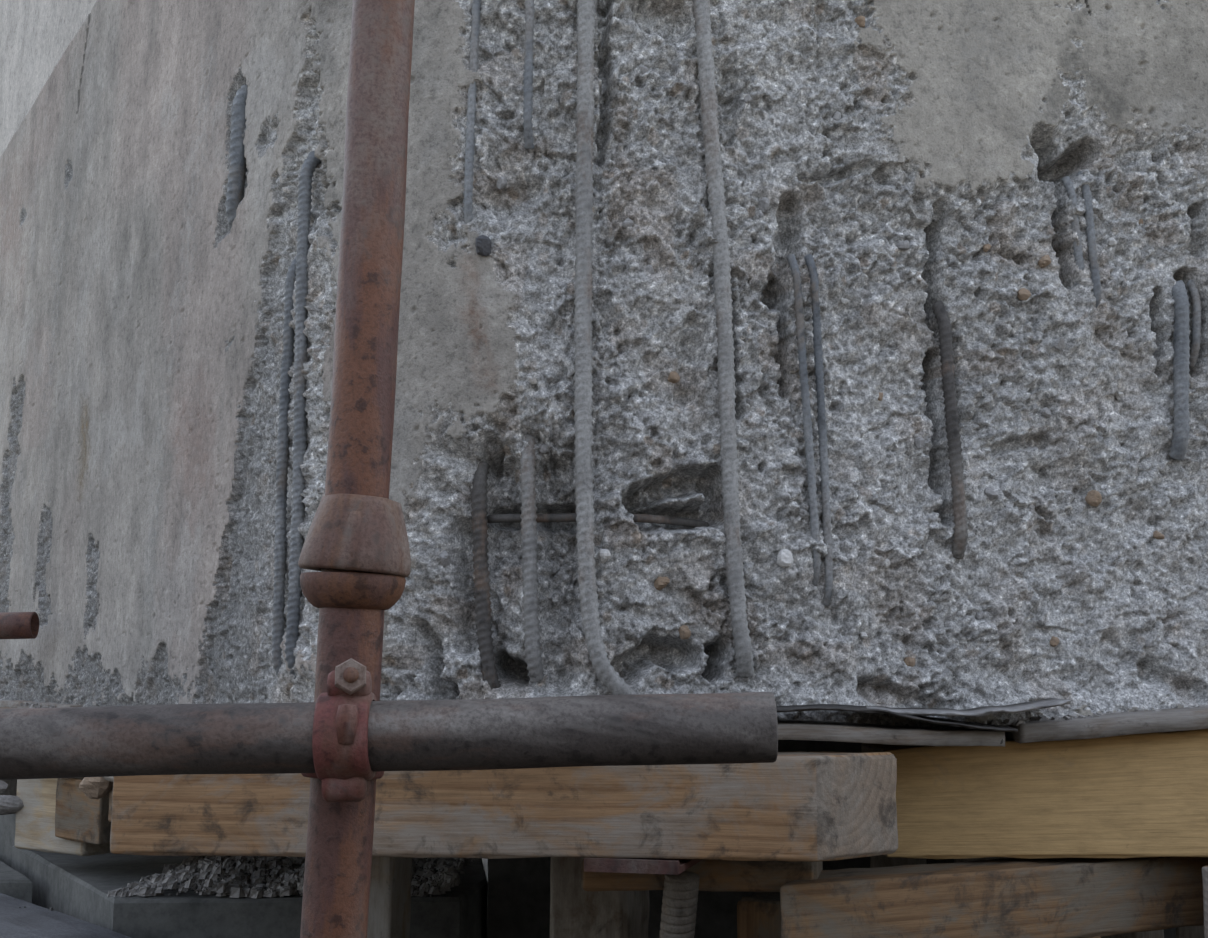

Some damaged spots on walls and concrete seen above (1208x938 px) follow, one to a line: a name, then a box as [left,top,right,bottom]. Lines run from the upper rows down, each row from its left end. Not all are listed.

spalling [0,0,342,707]
spalling [380,0,1208,726]